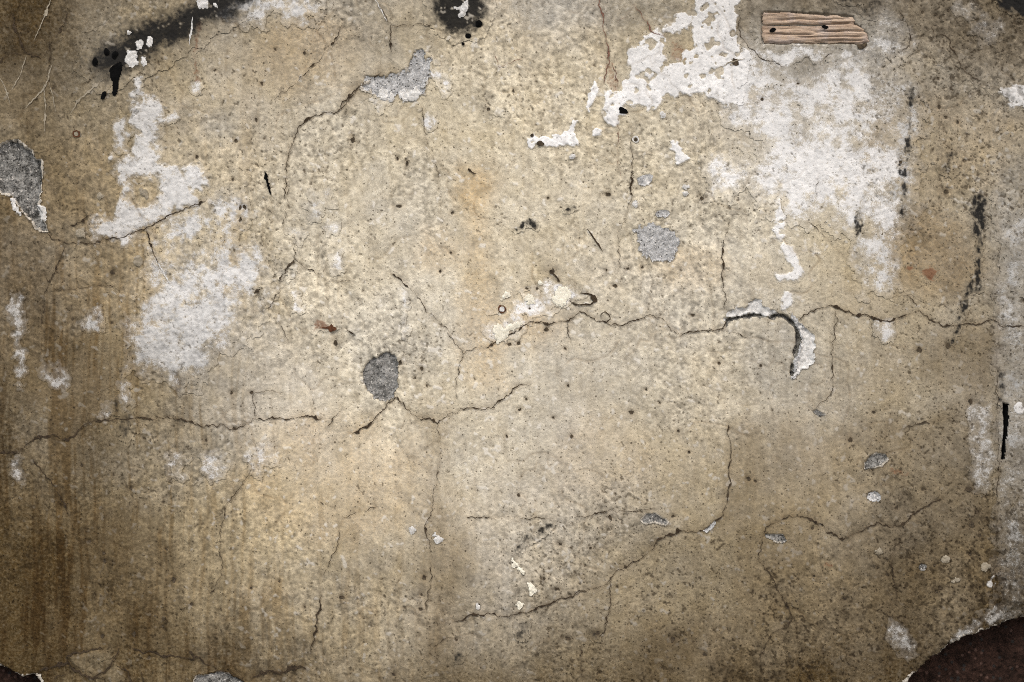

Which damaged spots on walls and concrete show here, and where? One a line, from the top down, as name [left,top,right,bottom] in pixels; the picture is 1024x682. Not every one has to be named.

spalling [360,49,439,132]
spalling [0,139,49,232]
crack [266,74,379,337]
leakage [0,191,214,669]
crack [0,223,742,603]
spalling [363,352,402,402]
spalling [723,290,816,379]
leakage [620,85,1009,682]
crack [800,295,1022,407]
crack [424,425,732,679]
crack [758,499,941,660]
spalling [902,615,1024,682]